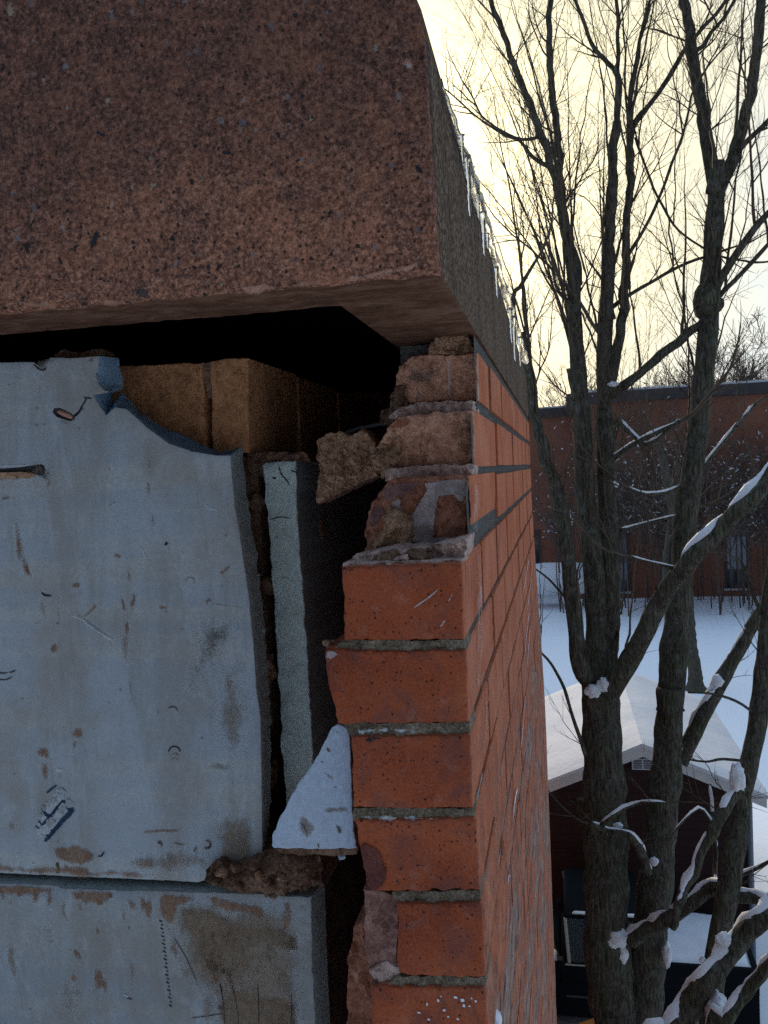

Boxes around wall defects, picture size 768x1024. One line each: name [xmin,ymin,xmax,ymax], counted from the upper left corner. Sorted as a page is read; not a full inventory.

rust [0,846,137,877]
rust [0,886,50,904]
rust [74,892,112,905]
rust [129,895,189,922]
rust [211,897,262,916]